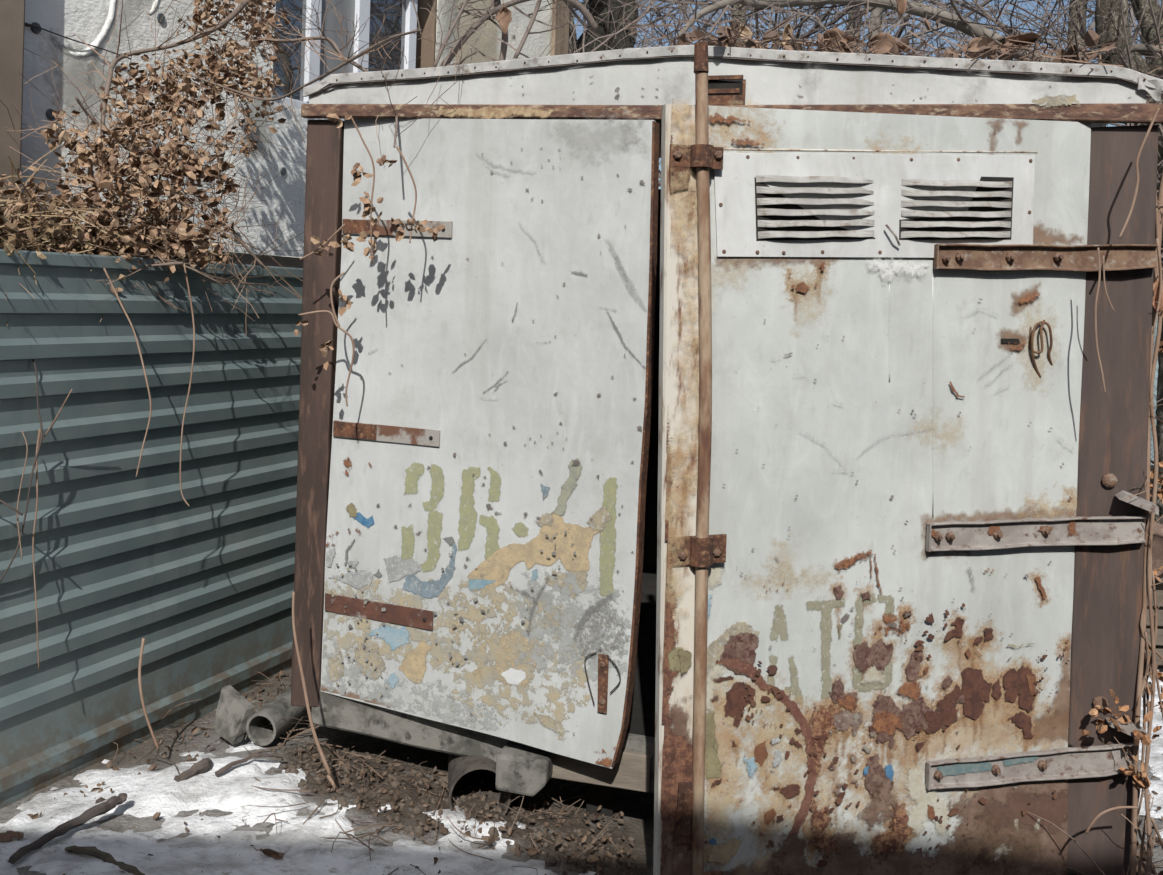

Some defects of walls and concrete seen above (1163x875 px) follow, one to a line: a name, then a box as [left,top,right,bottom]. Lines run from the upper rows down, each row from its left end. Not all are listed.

rust [708,113,772,148]
rust [719,257,834,307]
peeling [322,458,631,740]
rust [660,419,1077,875]